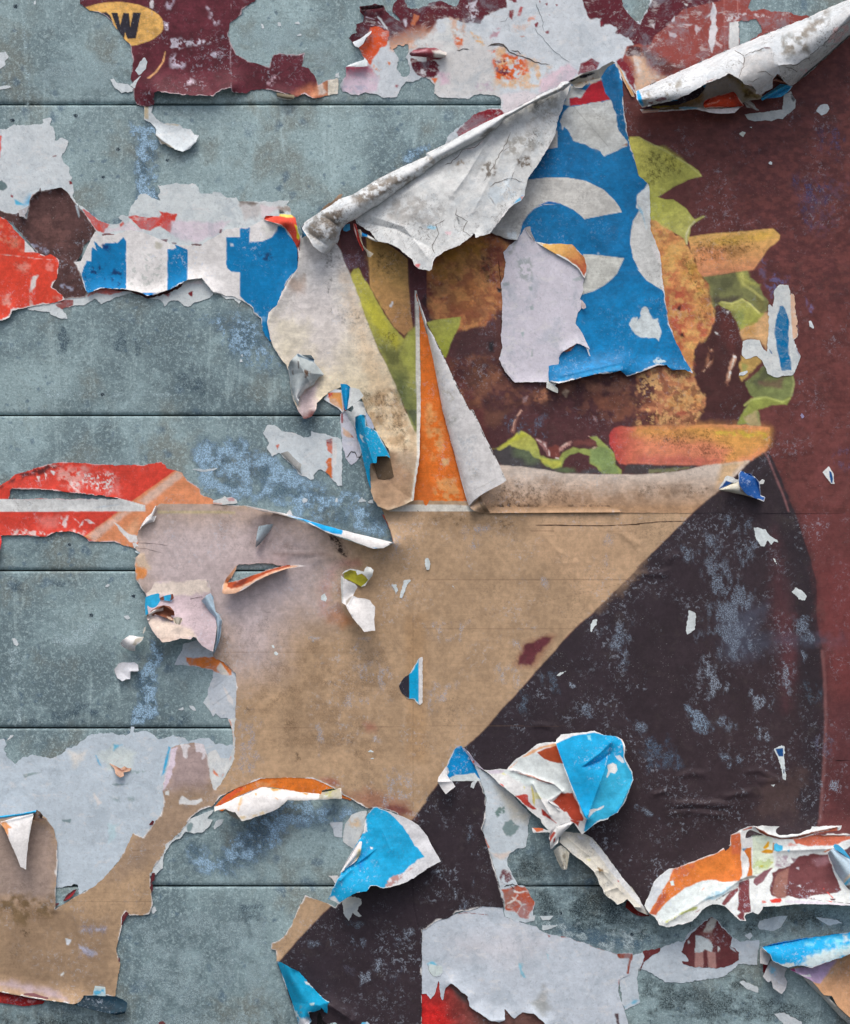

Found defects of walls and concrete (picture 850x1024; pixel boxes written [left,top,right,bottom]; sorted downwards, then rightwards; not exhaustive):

peeling [301,81,571,271]
peeling [417,296,506,513]
peeling [245,505,393,549]
peeling [213,787,342,829]
peeling [328,807,441,903]
peeling [484,731,850,1024]